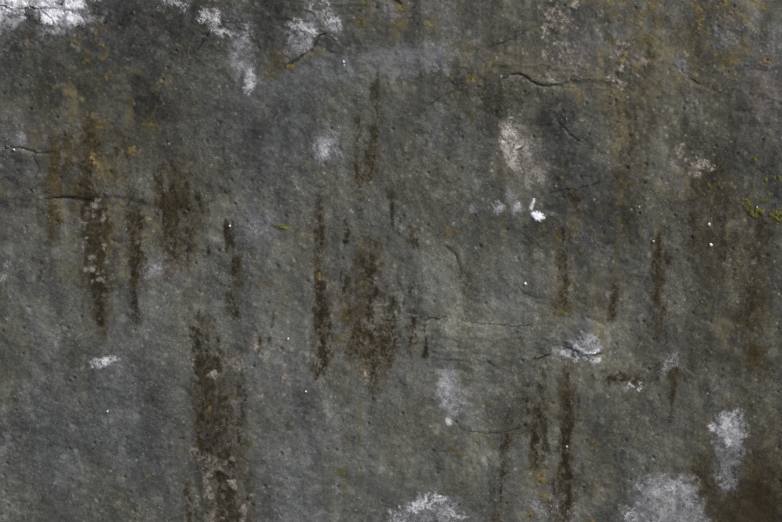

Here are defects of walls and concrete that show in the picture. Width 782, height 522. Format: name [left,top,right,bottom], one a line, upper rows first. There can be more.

crack [501,64,599,103]
damp [77,121,132,339]
damp [126,160,218,324]
damp [387,189,424,253]
damp [311,198,401,401]
damp [406,317,429,358]
damp [182,310,253,522]
damp [389,490,468,522]
damp [434,368,468,425]
damp [492,370,579,522]
damp [622,408,781,522]